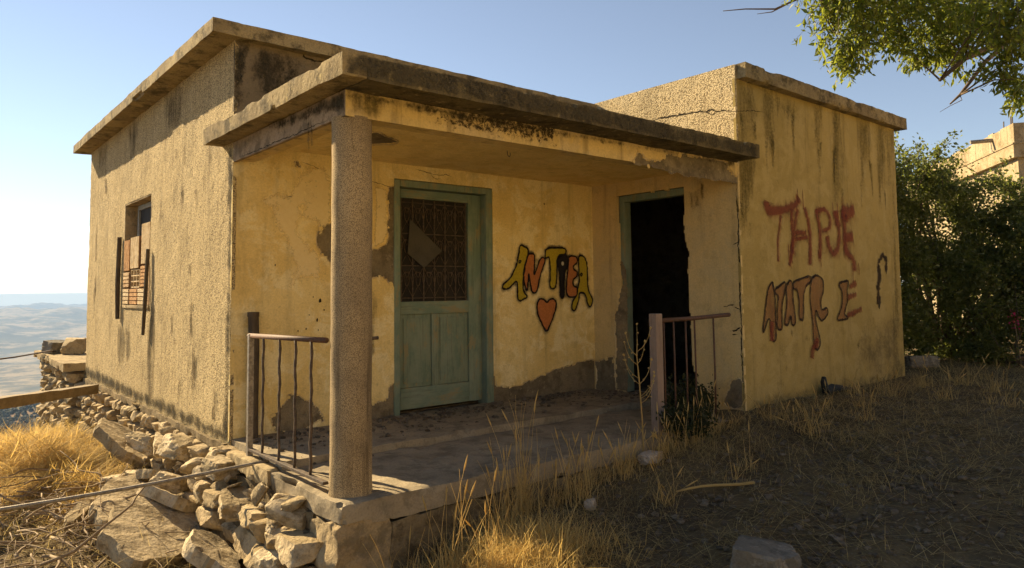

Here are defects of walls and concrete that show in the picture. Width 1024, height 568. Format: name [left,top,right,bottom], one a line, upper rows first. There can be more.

leakage [234,49,297,103]
leakage [348,55,756,214]
spalling [632,149,737,184]
crack [655,109,760,120]
peeling [264,161,331,285]
peeling [372,186,394,285]
leakage [85,287,229,443]
peeling [270,391,325,432]
peeling [494,261,629,402]